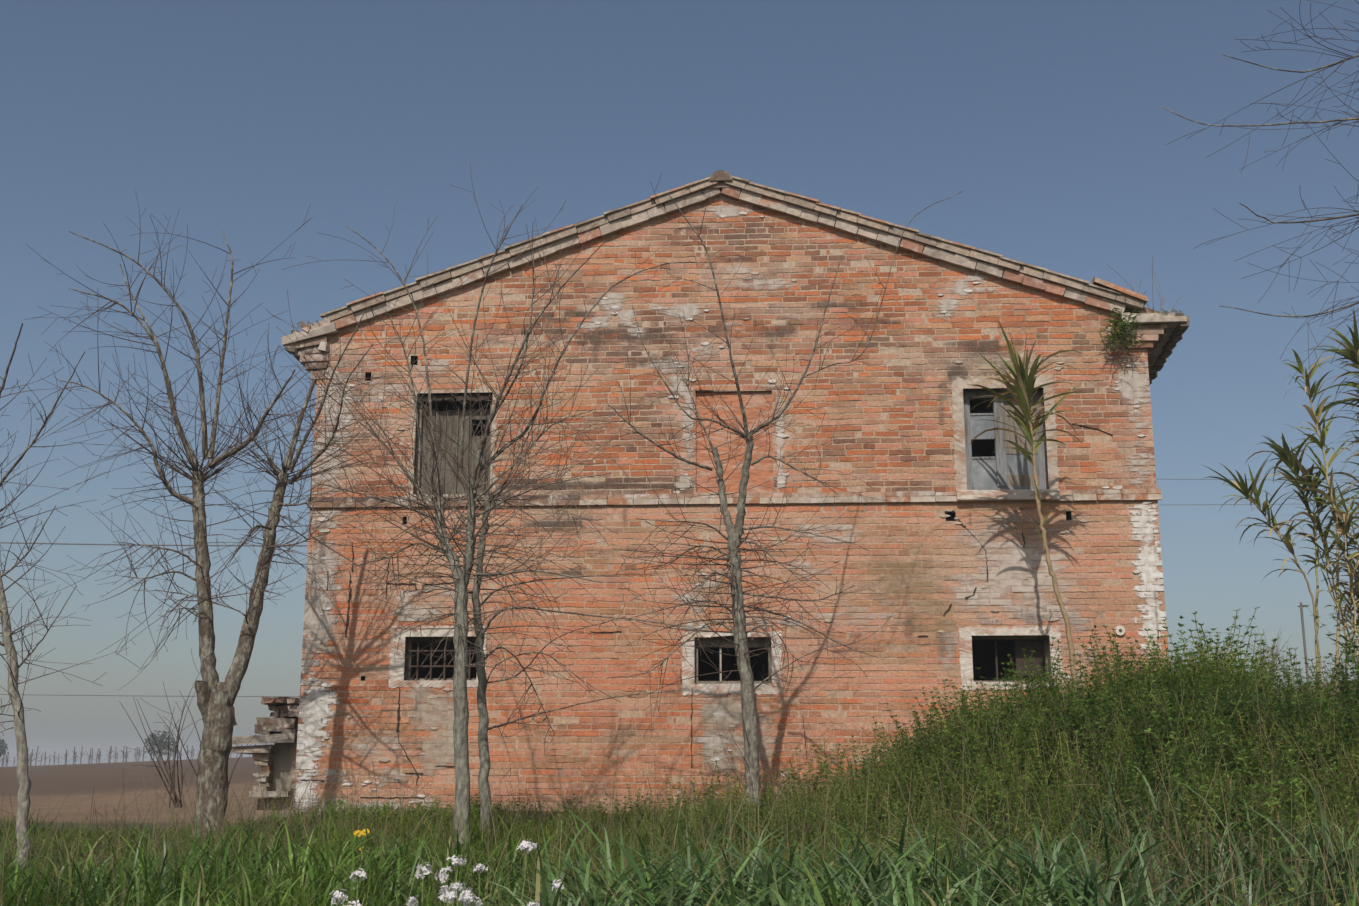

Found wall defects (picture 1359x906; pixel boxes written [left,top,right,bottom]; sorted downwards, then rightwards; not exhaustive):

peeling [312,356,412,494]
peeling [416,360,449,373]
peeling [1102,356,1155,489]
crack [326,542,354,637]
crack [385,559,454,599]
crack [918,520,988,637]
peeling [1128,501,1167,659]
peeling [293,511,455,815]